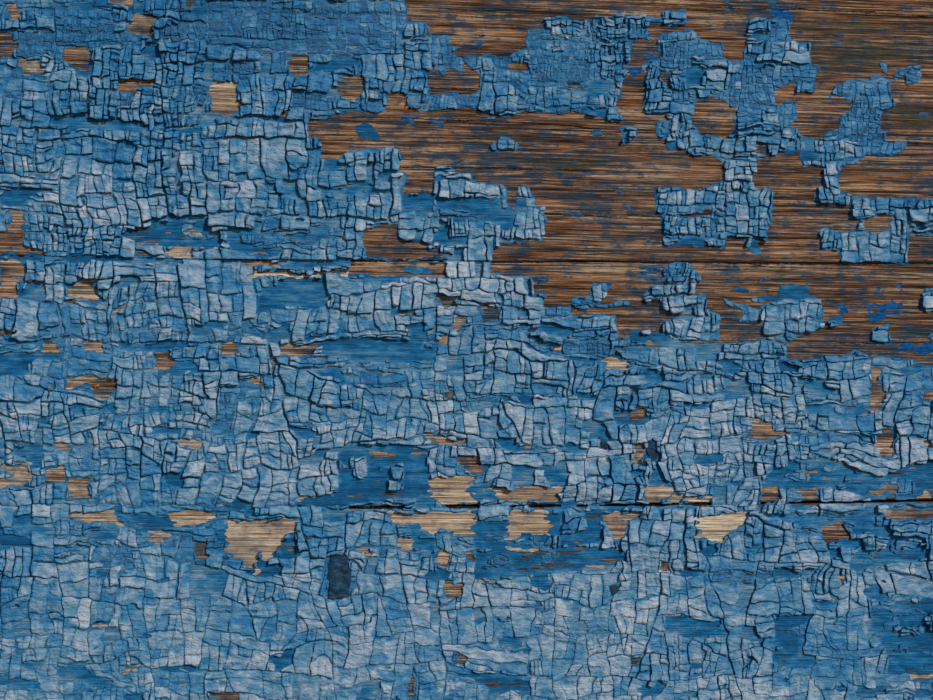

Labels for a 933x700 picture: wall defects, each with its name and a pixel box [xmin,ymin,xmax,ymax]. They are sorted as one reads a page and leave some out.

peeling [641,17,933,266]
crack [0,254,464,265]
crack [486,244,933,268]
peeling [919,288,933,312]
peeling [0,0,687,700]
peeling [502,261,872,599]
crack [350,504,411,512]
crack [448,503,477,511]
crack [512,501,587,509]
crack [623,500,709,508]
peeling [686,355,933,700]
peeling [387,504,877,700]